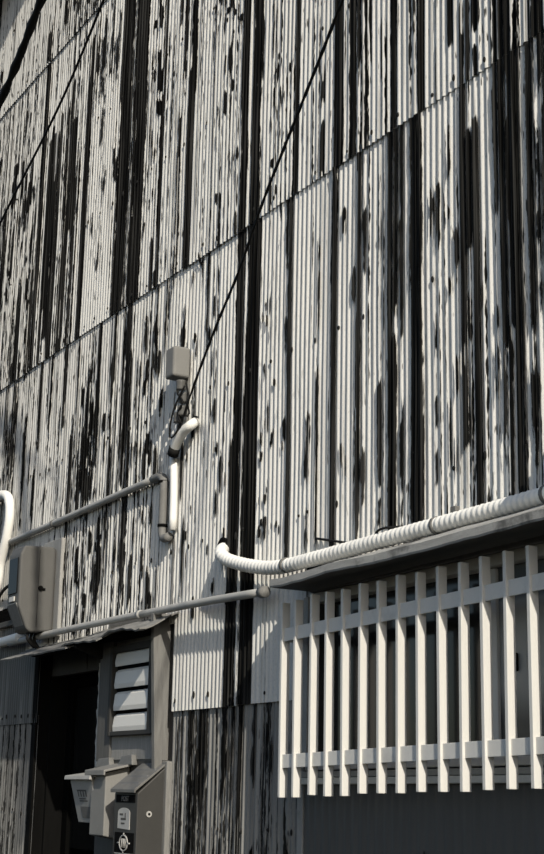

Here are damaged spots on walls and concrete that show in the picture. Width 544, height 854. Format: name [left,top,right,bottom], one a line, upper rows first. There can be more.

corrosion [5,22,96,628]
corrosion [102,0,151,608]
corrosion [152,0,199,352]
corrosion [221,567,256,854]
corrosion [227,0,265,559]
corrosion [282,0,301,557]
corrosion [303,365,319,552]
corrosion [317,0,484,547]
corrosion [491,0,527,495]
corrosion [531,0,543,37]